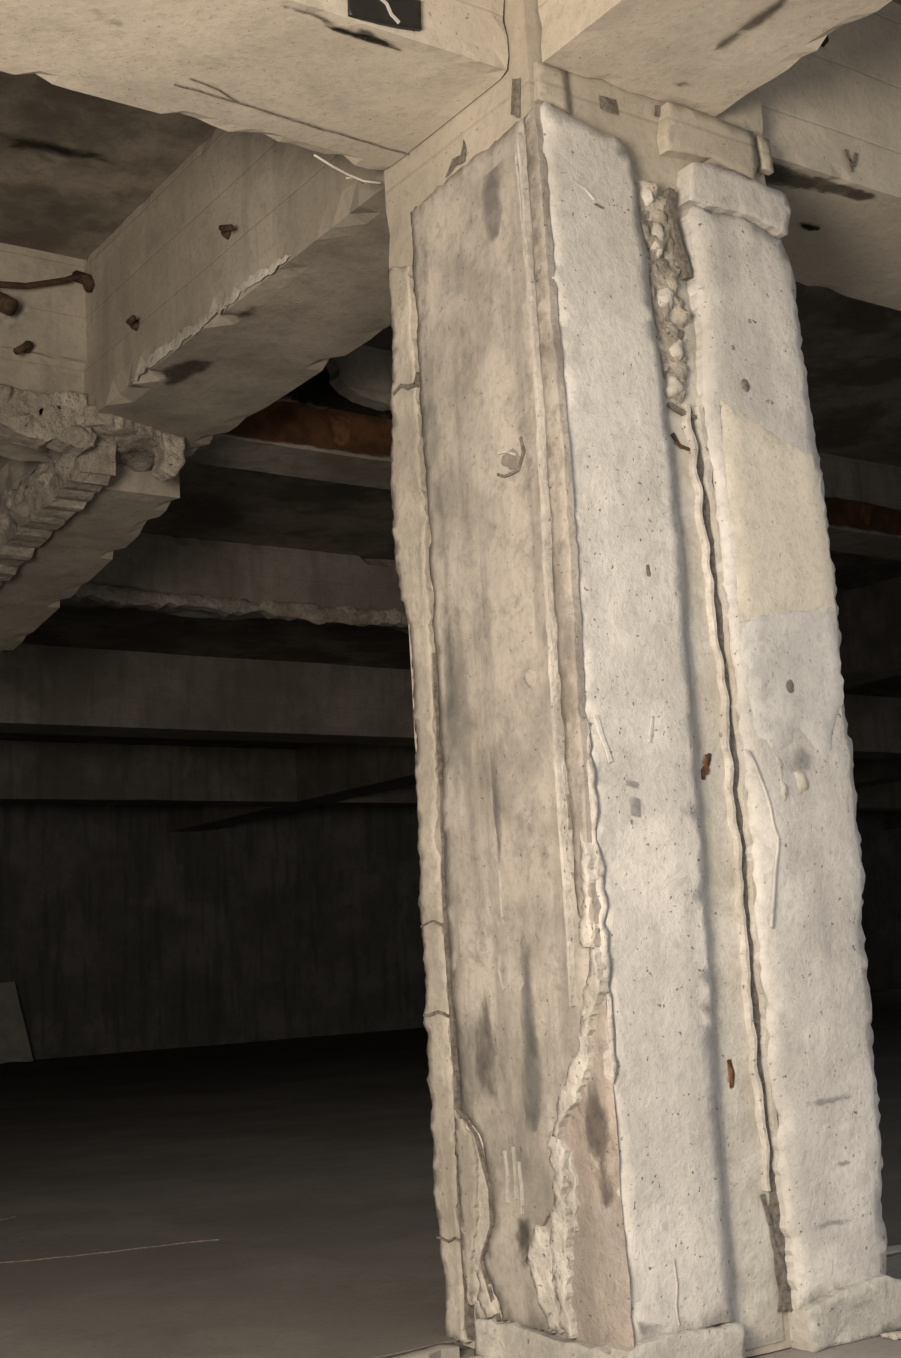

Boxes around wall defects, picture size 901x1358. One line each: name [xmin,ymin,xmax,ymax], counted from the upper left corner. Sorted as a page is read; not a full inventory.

water stain [717,0,784,49]
crack [174,78,409,155]
spalling [0,270,95,316]
spalling [125,255,291,385]
flaking render [636,178,690,404]
corrosion [223,402,393,457]
spalling [0,384,186,585]
corrosion [824,497,901,535]
spalling [66,582,409,628]
corrosion [701,753,712,780]
crack [421,653,475,1339]
flaking render [525,721,634,1349]